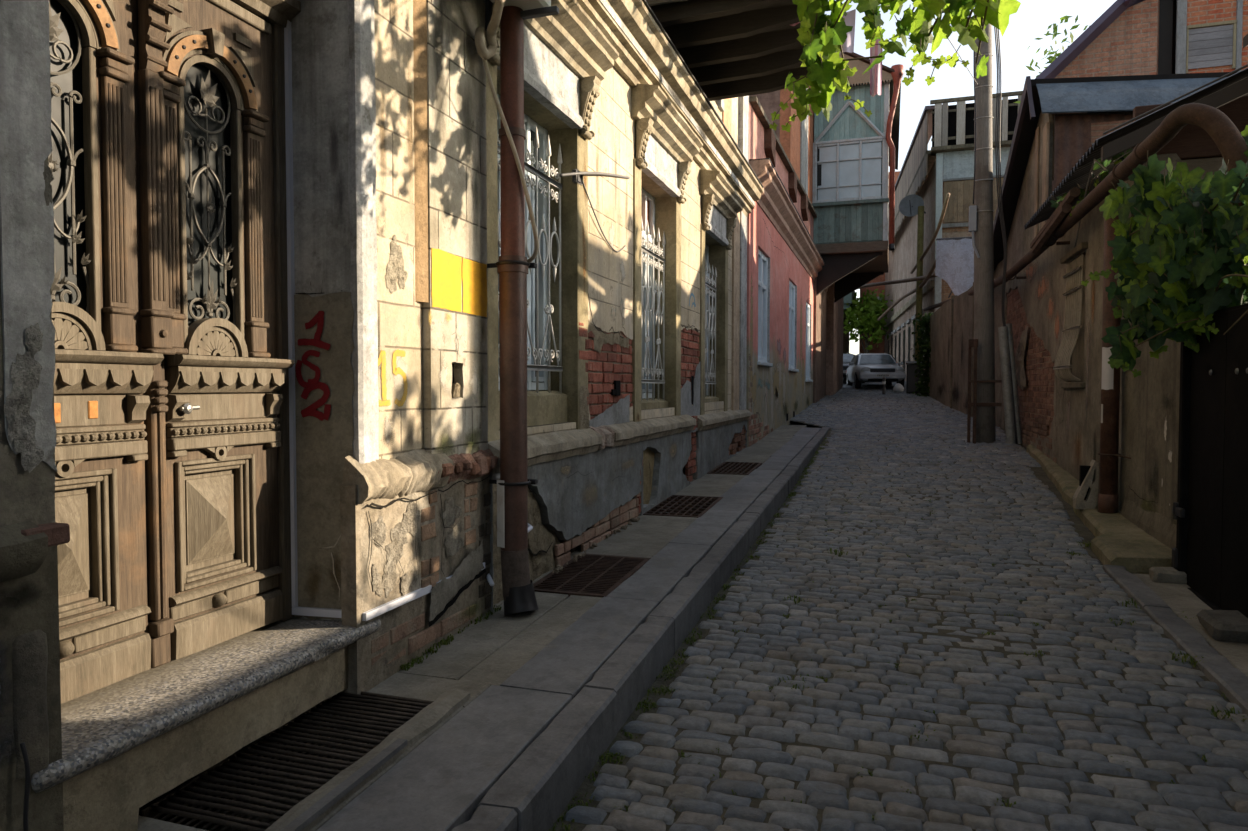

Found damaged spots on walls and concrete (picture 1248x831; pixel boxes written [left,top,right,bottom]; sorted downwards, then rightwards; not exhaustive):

spalling [4,323,44,473]
flaking render [579,301,633,420]
flaking render [681,328,700,482]
flaking render [368,478,504,665]
flaking render [528,448,655,581]